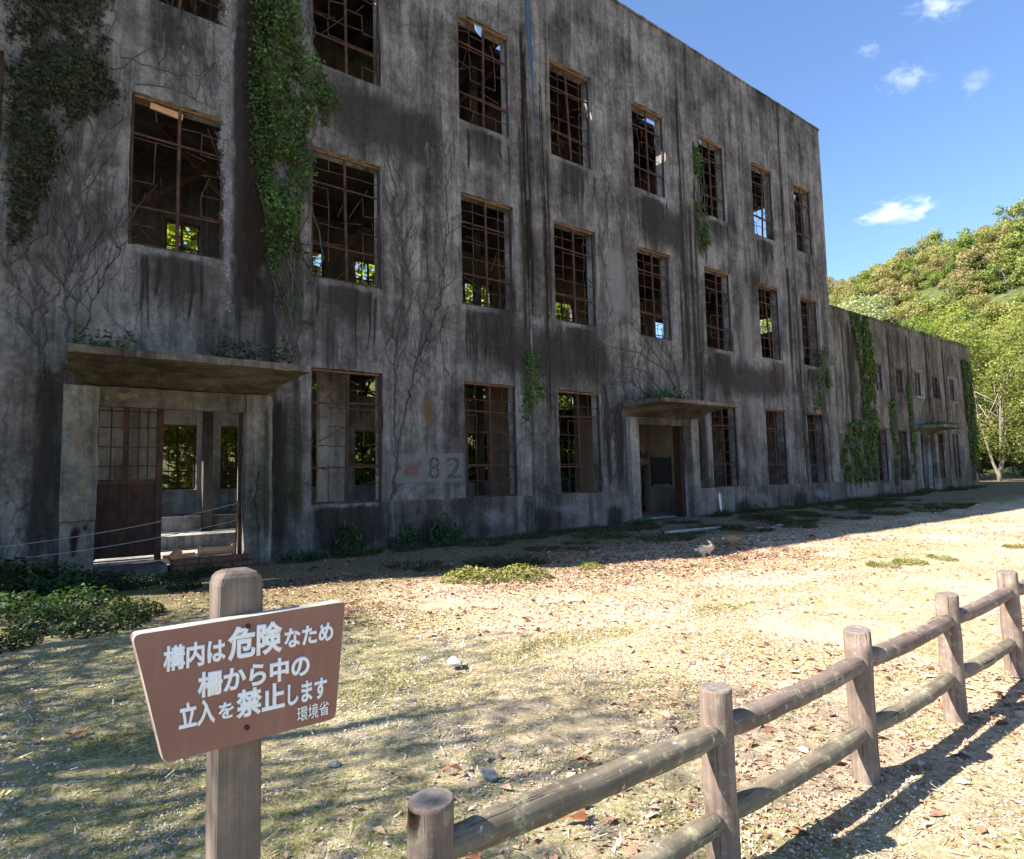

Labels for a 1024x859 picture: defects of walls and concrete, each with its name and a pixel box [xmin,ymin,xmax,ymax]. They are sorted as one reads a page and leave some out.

water stain [140,256,204,329]
water stain [212,0,278,352]
water stain [316,285,377,348]
water stain [466,0,606,408]